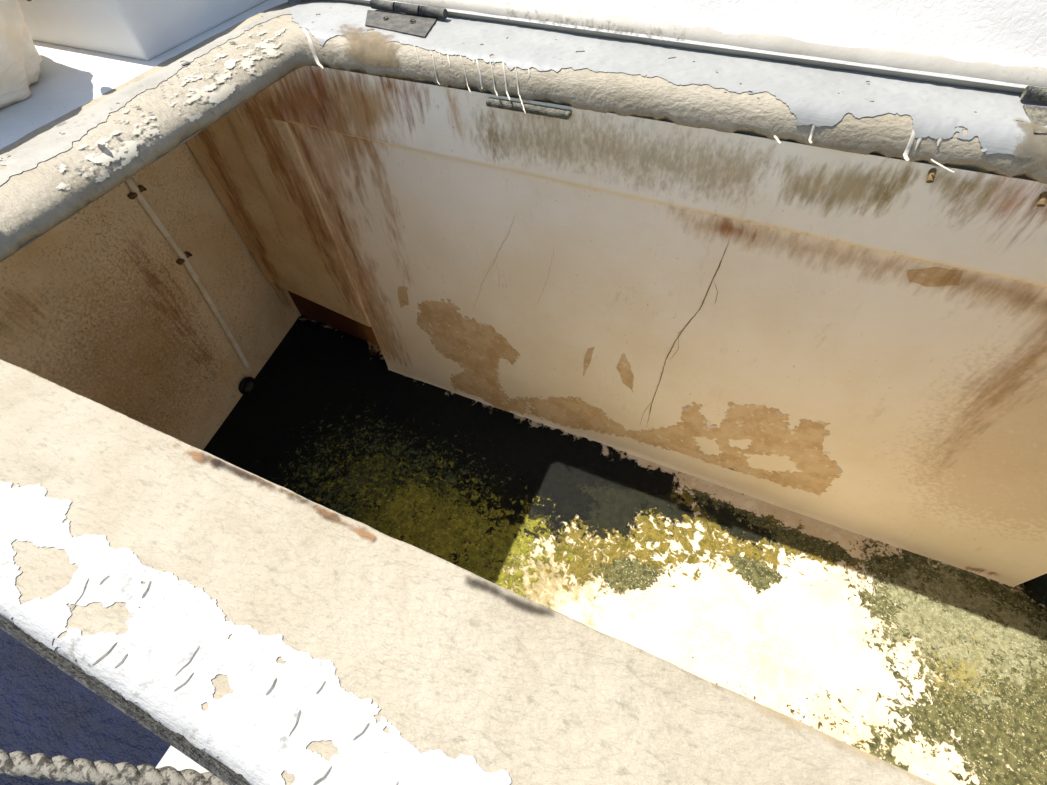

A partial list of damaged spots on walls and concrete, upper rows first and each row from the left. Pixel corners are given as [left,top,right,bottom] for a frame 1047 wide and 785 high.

peeling [0,0,1047,190]
mould [203,315,777,580]
peeling [397,286,843,495]
crack [640,232,733,427]
peeling [907,267,963,287]
peeling [0,481,512,785]
mould [777,688,865,734]